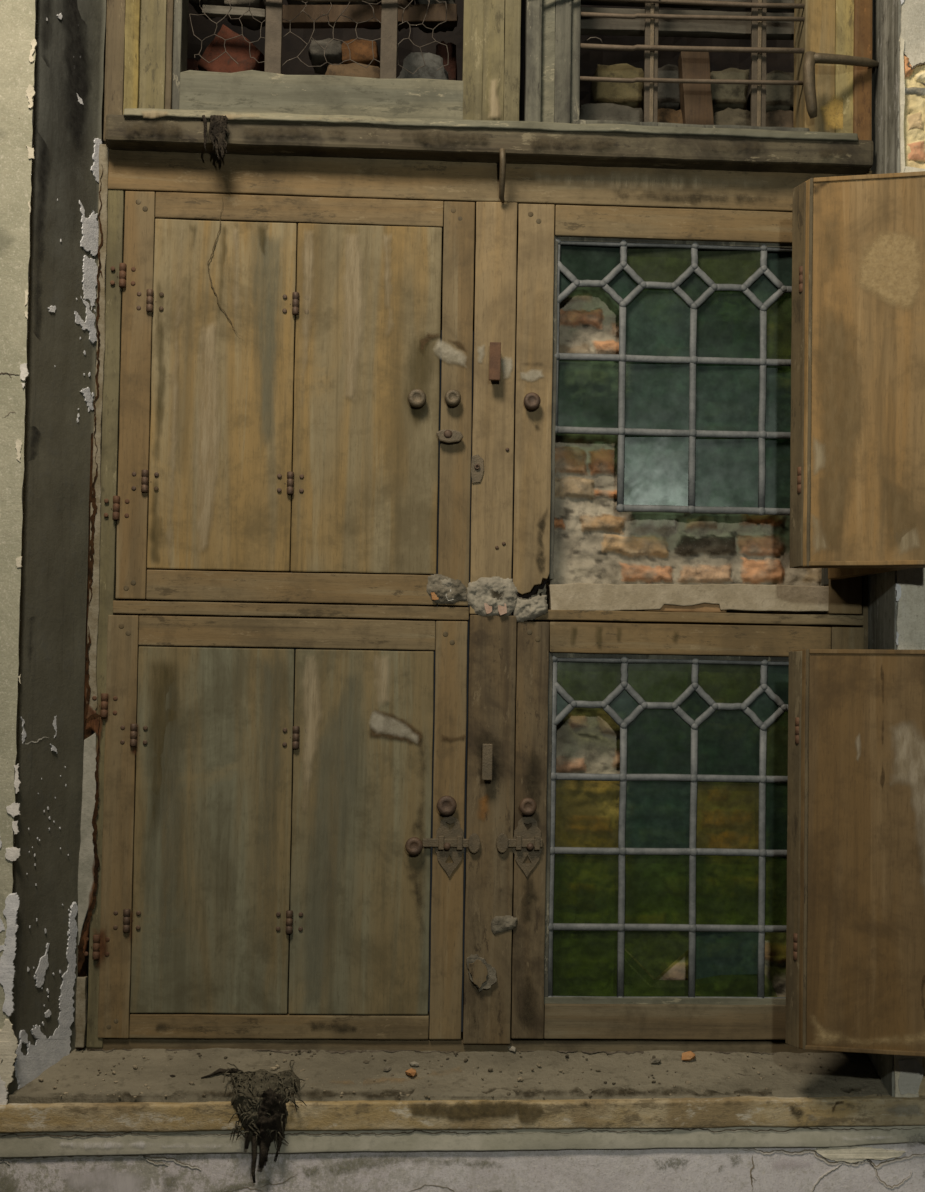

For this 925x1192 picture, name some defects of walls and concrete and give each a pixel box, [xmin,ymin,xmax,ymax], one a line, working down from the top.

peeling [90,138,102,183]
flaking render [899,37,925,173]
peeling [74,200,99,355]
peeling [77,372,94,422]
flaking render [0,893,78,1105]
crack [285,1127,925,1192]